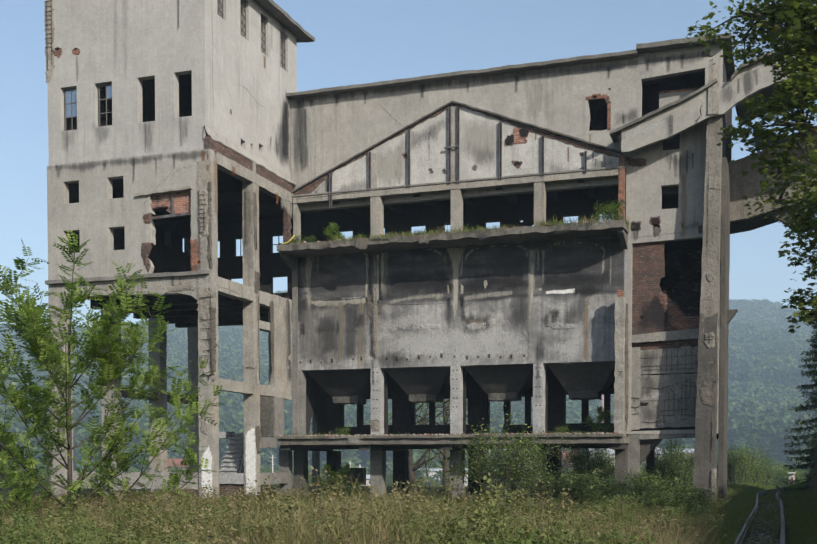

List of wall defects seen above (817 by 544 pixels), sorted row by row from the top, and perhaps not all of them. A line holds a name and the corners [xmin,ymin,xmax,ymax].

spalling [44,0,62,83]
flaking render [504,127,529,146]
flaking render [141,242,154,272]
damp [302,247,512,358]
damp [491,240,575,312]